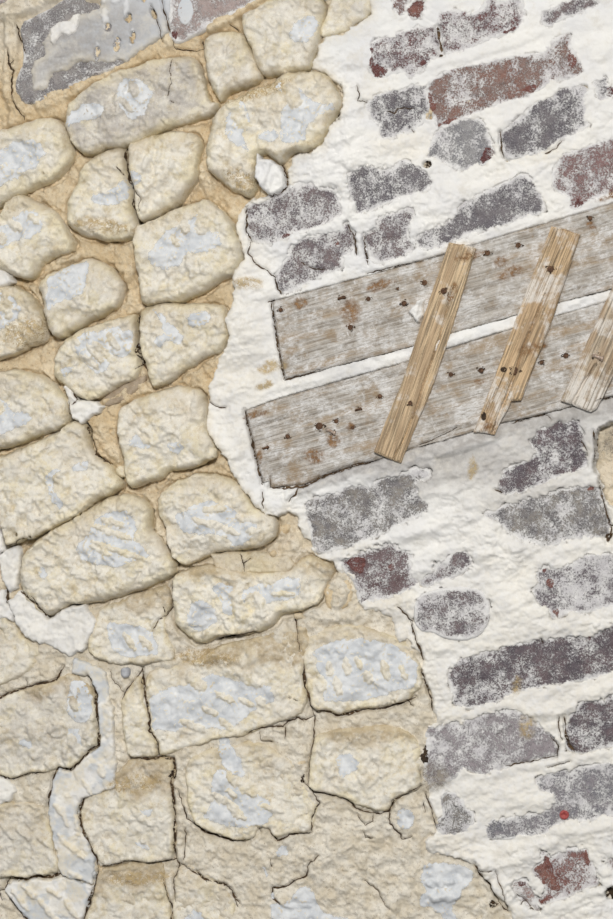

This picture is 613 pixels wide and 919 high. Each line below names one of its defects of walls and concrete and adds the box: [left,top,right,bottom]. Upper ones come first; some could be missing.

spalling [408,5,423,16]
peeling [50,13,80,46]
spalling [369,48,388,78]
peeling [225,101,287,196]
spalling [480,147,495,164]
corrosion [342,302,358,324]
corrosion [306,436,338,463]
spalling [346,557,366,573]
crack [6,589,50,617]
peeling [313,638,418,702]
crack [0,607,437,919]
spalling [534,856,561,904]